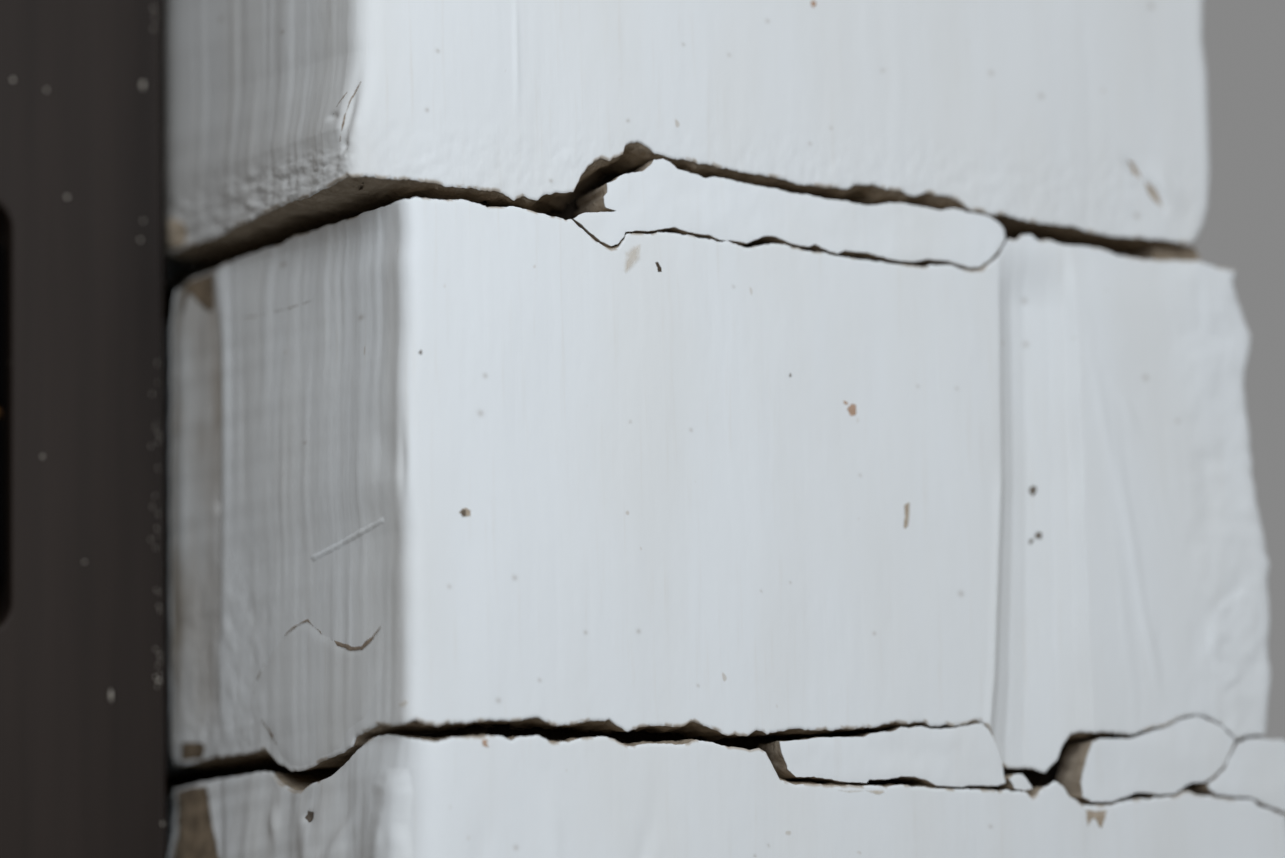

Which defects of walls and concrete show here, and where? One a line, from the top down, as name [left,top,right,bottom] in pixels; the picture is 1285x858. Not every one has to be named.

crack [545,173,620,220]
crack [409,723,886,750]
crack [265,765,340,776]
crack [853,778,909,786]
crack [954,734,1121,790]
peeling [173,787,219,858]